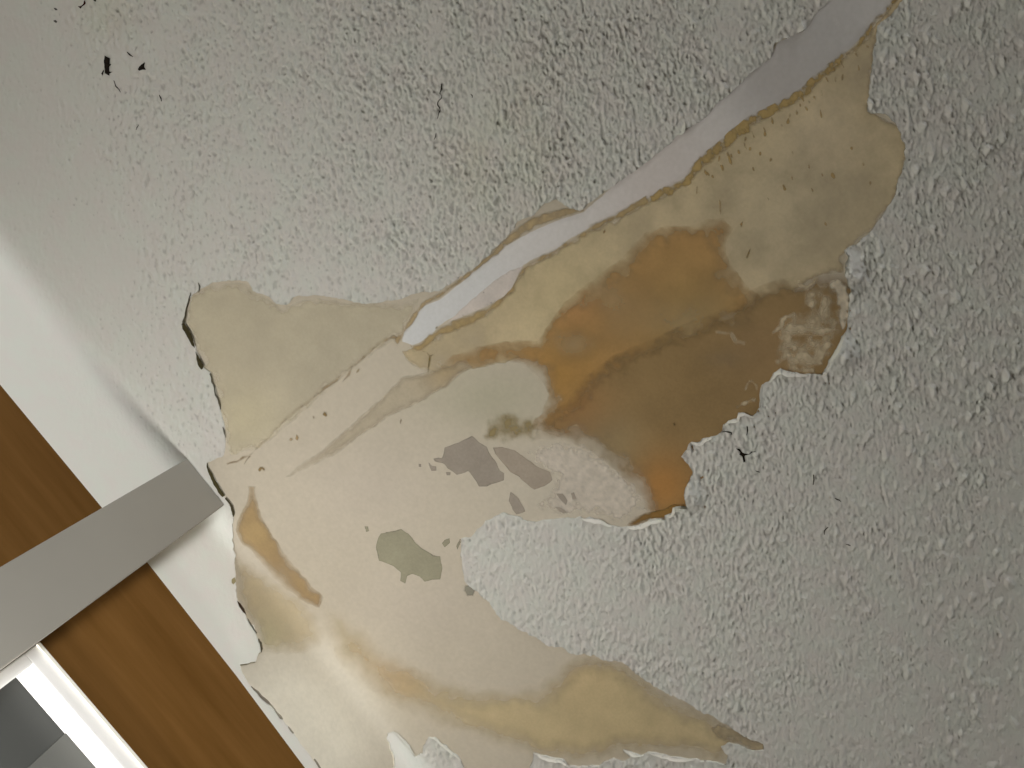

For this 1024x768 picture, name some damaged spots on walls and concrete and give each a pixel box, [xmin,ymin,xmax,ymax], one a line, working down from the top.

damp [190,0,905,525]
peeling [185,115,773,768]
peeling [725,370,807,426]
damp [238,499,320,644]
damp [383,666,763,753]